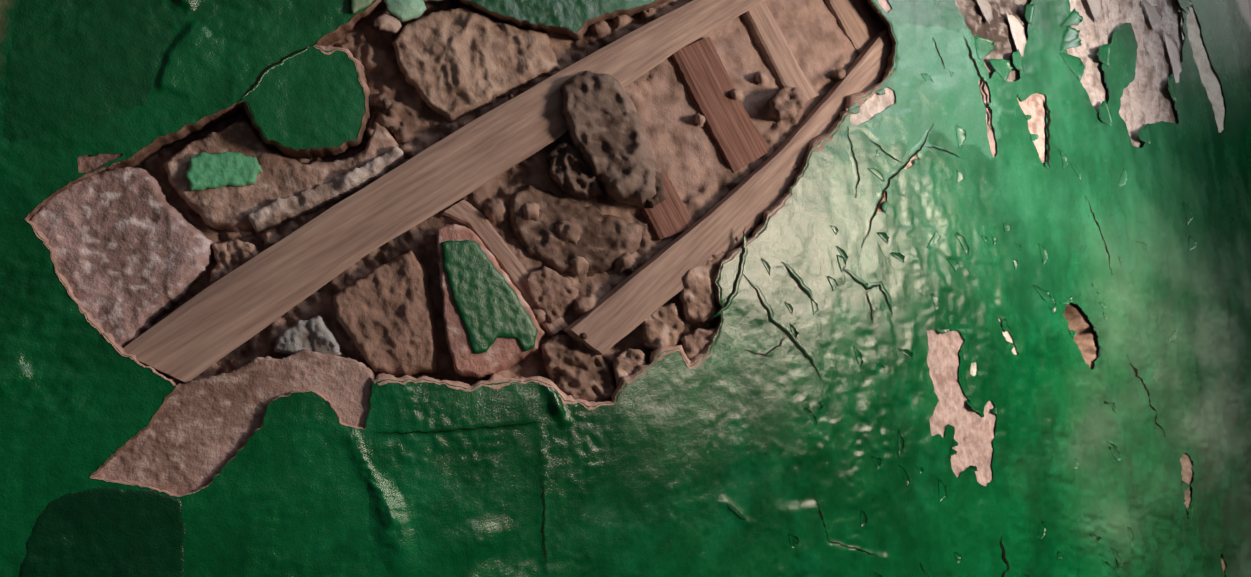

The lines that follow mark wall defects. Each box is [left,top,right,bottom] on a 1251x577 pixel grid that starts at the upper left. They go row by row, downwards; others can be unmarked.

peeling [955,0,1081,181]
peeling [1059,0,1229,148]
spalling [24,0,899,497]
crack [712,228,822,379]
peeling [877,232,905,263]
crack [841,123,959,321]
peeling [927,231,969,272]
peeling [981,223,1021,270]
peeling [998,318,1019,355]
spalling [1032,283,1108,370]
peeling [897,328,997,502]